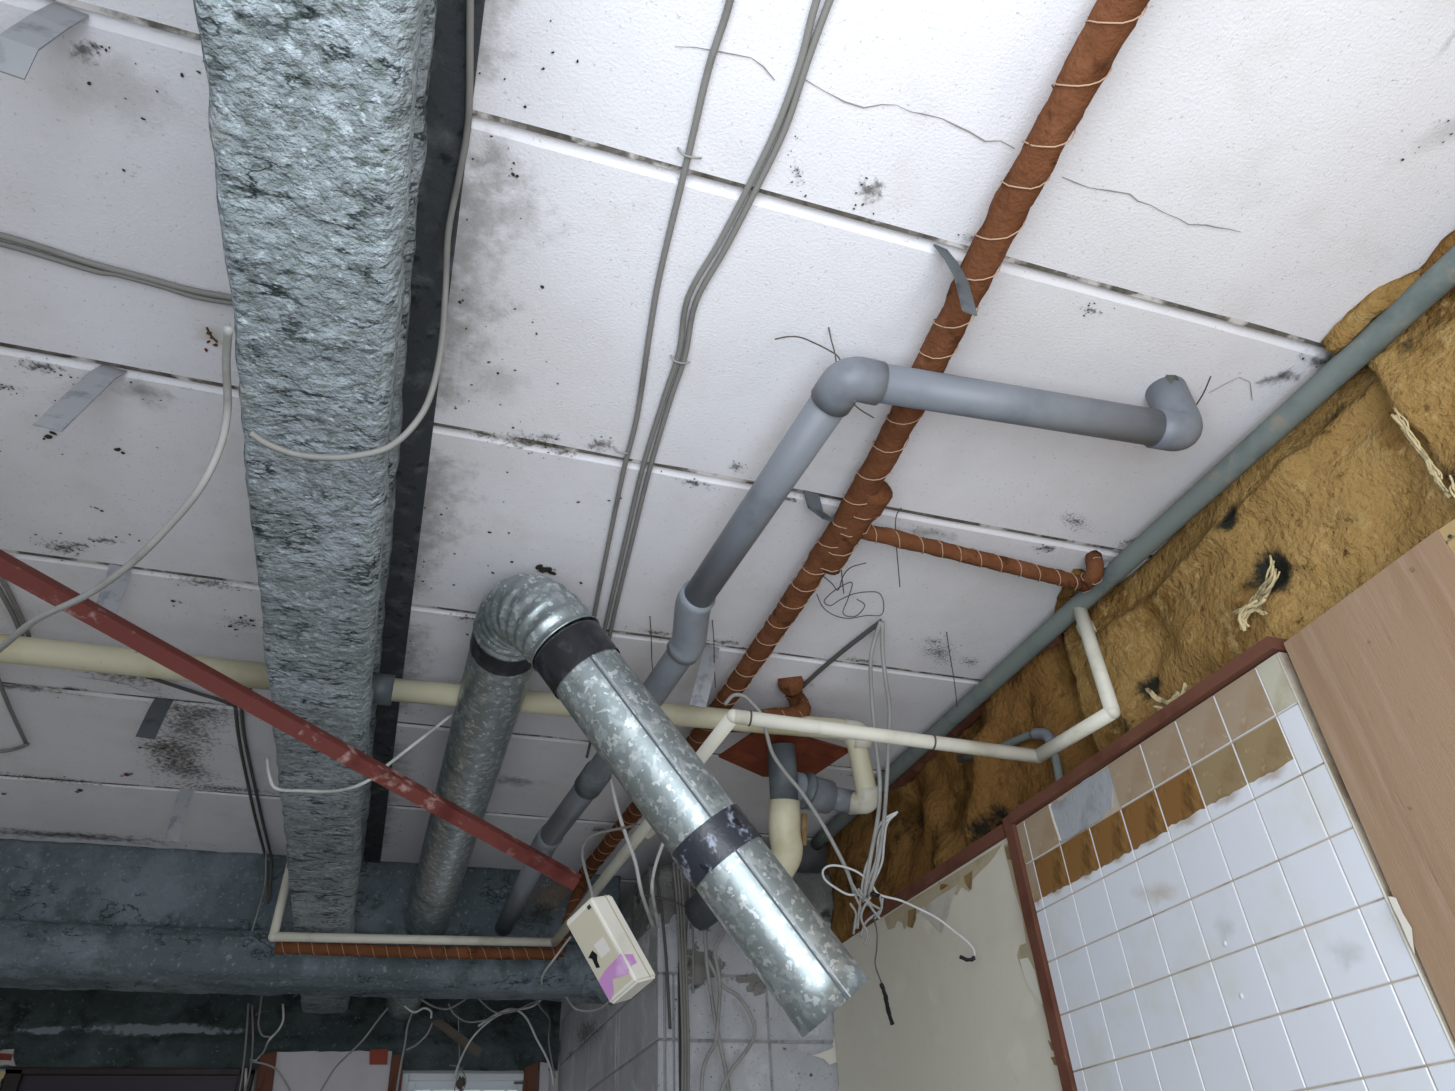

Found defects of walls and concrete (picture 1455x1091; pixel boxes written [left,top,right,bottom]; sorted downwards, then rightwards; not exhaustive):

crack [675,46,1015,149]
crack [1062,177,1240,232]
damp [1,772,103,795]
damp [138,704,270,793]
peeling [1048,768,1114,843]